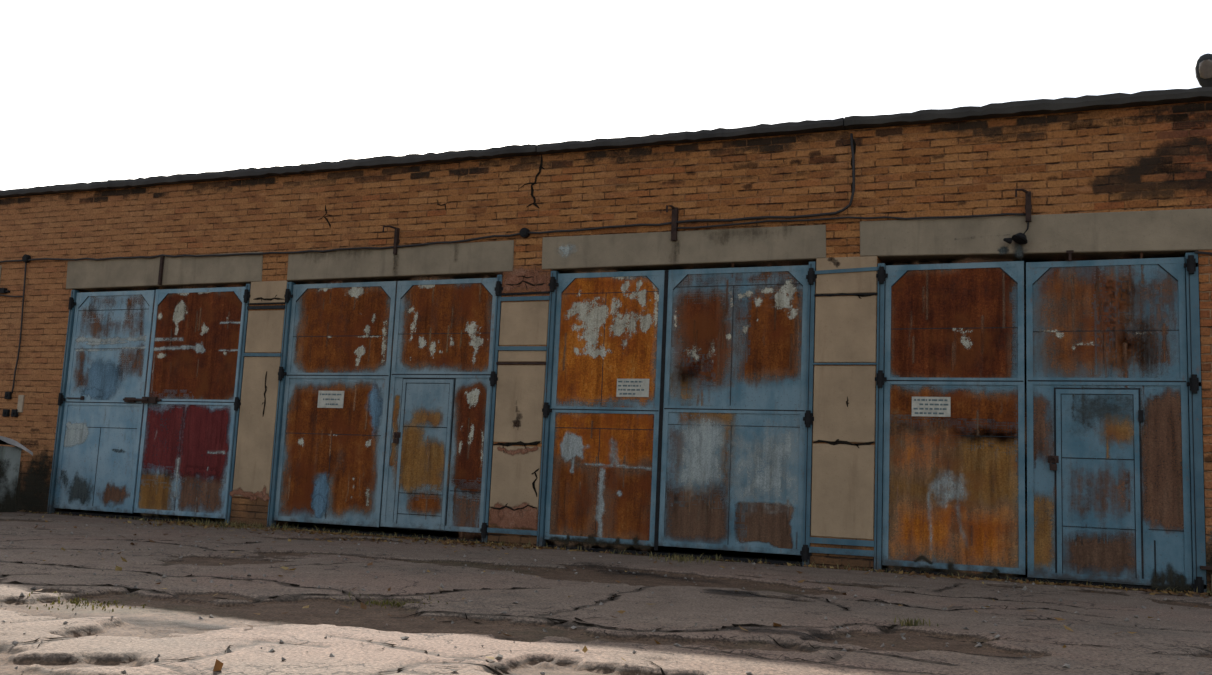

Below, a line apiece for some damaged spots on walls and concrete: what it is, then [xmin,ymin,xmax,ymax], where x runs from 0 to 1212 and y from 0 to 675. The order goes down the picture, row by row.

crack [519,155,544,208]
corrosion [75,285,242,405]
peeling [158,292,212,335]
corrosion [280,277,493,536]
peeling [408,308,484,364]
peeling [564,271,659,359]
corrosion [550,265,803,549]
peeling [687,279,799,360]
corrosion [888,259,1054,580]
corrosion [1033,252,1184,532]
peeling [560,433,651,537]
crack [0,539,1212,675]